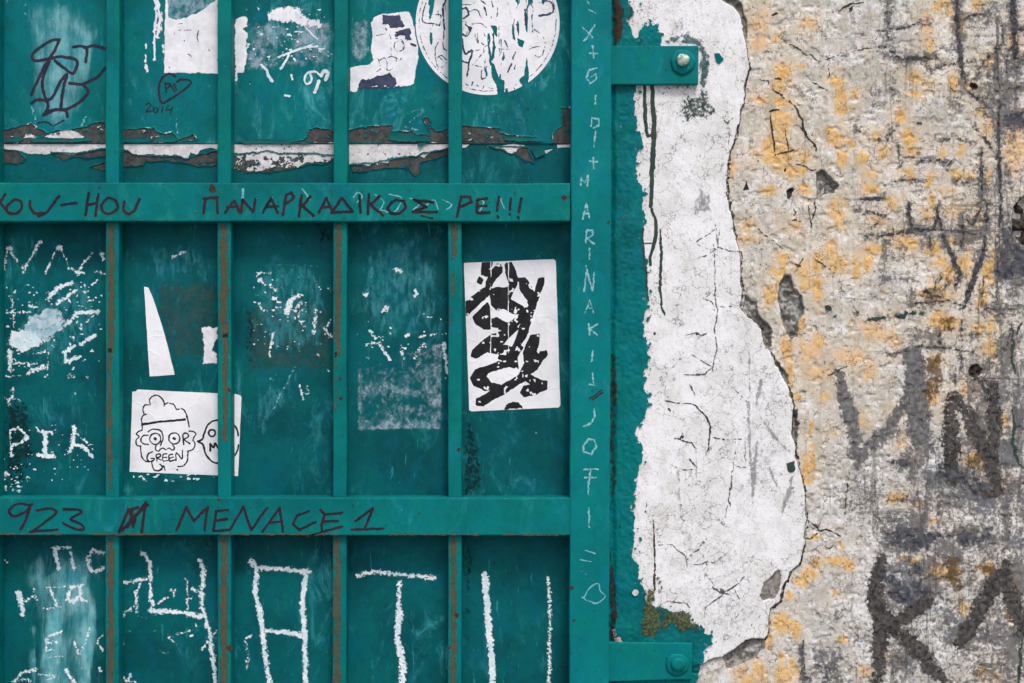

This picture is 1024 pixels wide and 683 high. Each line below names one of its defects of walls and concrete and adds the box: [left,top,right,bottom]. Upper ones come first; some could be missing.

spalling [723,0,747,39]
peeling [4,120,106,171]
peeling [124,126,218,168]
peeling [234,126,334,174]
peeling [349,115,448,177]
peeling [462,106,570,165]
rust [106,224,116,489]
rust [218,224,231,441]
rust [334,223,343,408]
crack [659,58,850,650]
spalling [743,275,805,349]
spalling [723,639,765,668]